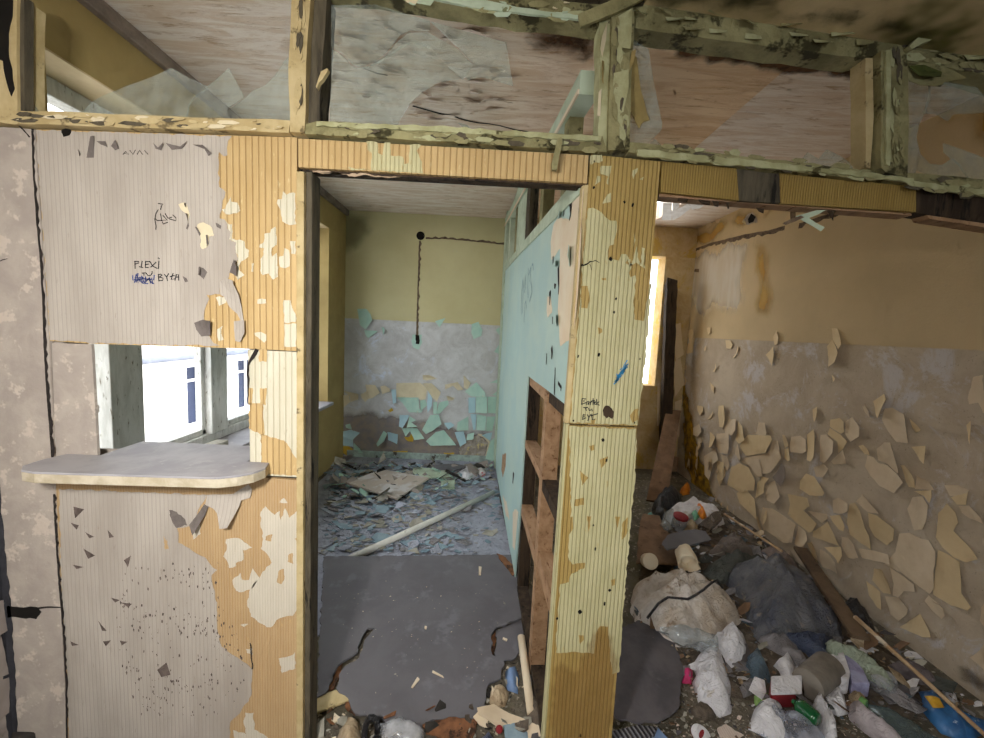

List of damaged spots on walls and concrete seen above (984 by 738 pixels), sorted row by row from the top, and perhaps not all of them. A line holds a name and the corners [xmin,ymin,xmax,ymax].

peeling [645,144,876,181]
peeling [890,45,984,167]
peeling [0,112,284,346]
crack [19,126,55,457]
peeling [343,375,514,483]
peeling [674,323,706,438]
peeling [827,328,841,381]
spalling [503,496,518,550]
peeling [686,394,984,637]
peeling [0,600,10,719]
crack [0,491,68,738]
peeling [59,484,252,738]